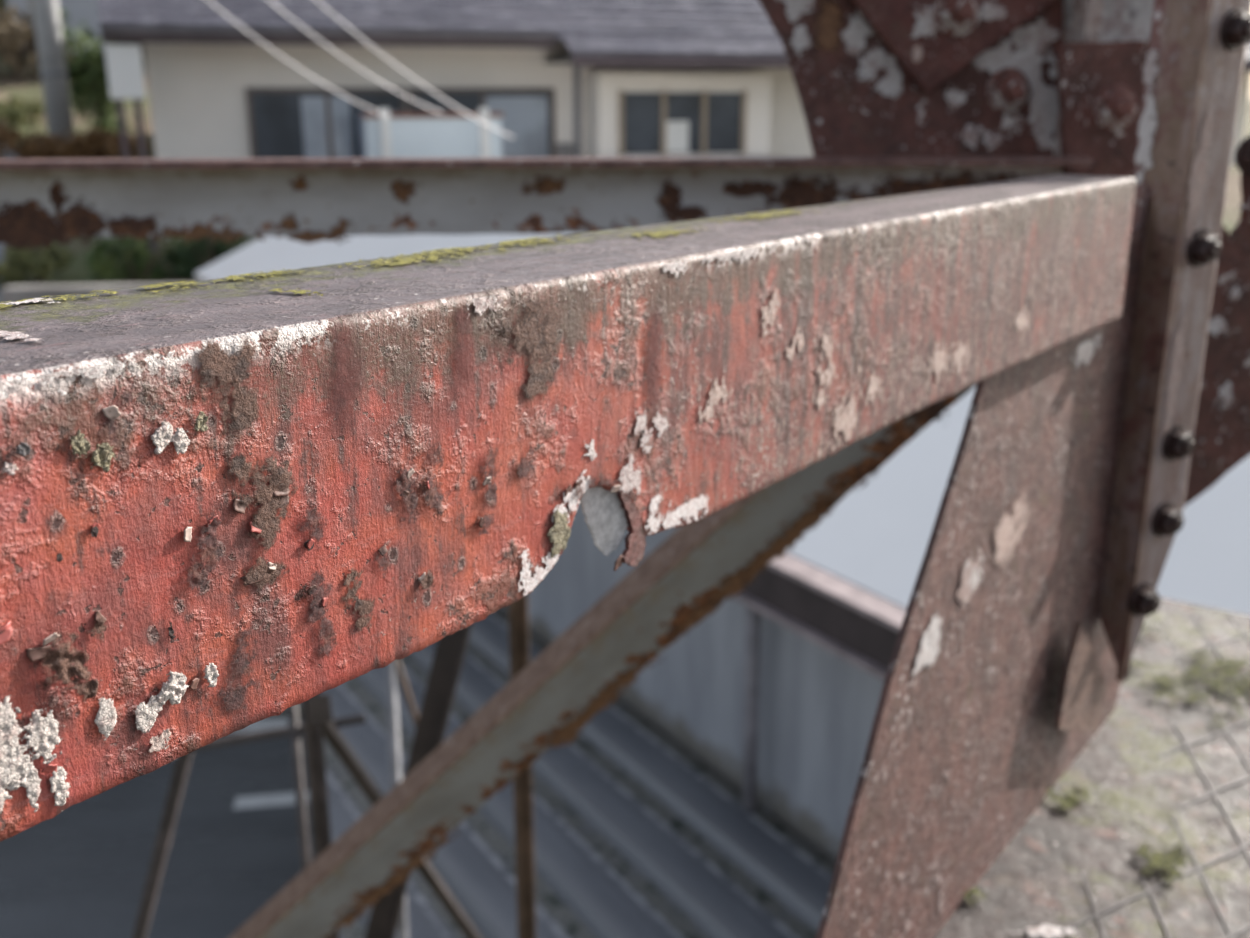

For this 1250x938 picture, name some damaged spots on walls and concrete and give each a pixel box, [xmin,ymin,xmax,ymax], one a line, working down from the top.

rust [0,181,351,249]
rust [656,176,707,222]
rust [722,170,1046,209]
peeling [609,407,709,534]
peeling [518,439,598,596]
rust [26,611,107,702]
rust [307,568,375,656]
rust [499,463,881,791]
peeling [912,490,1031,676]
peeling [0,695,71,813]
peeling [94,697,117,740]
peeling [135,663,219,756]